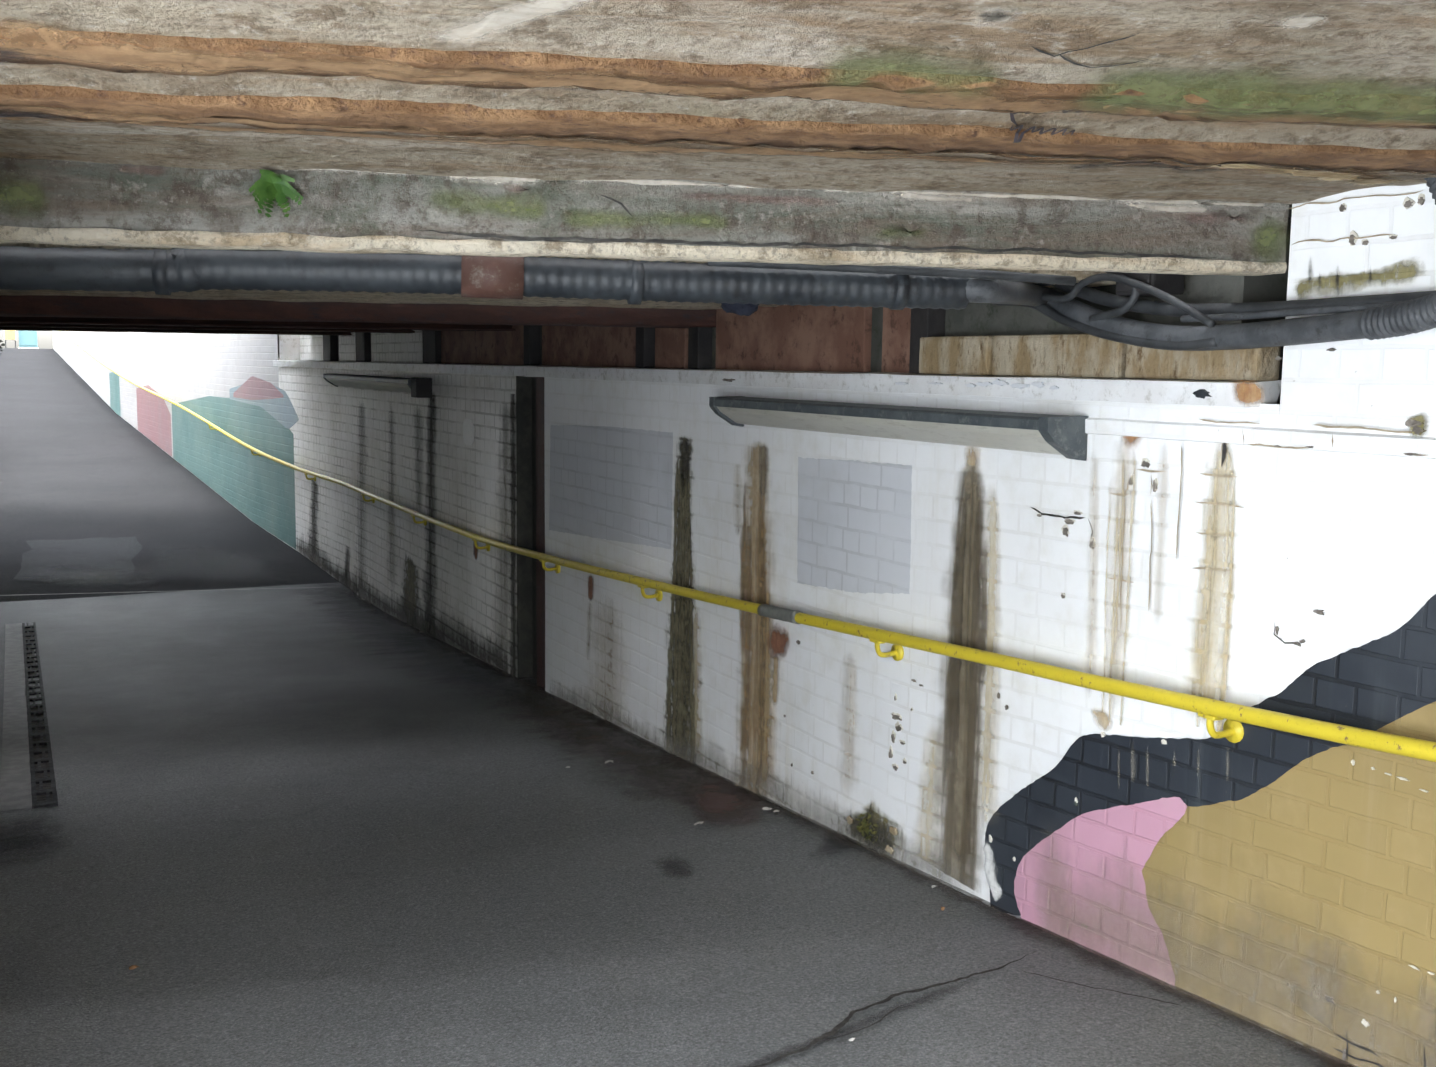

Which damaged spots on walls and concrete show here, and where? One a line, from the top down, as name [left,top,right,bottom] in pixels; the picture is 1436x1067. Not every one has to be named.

water stain [309,480,318,551]
water stain [345,407,364,582]
water stain [389,395,437,620]
water stain [498,394,518,677]
water stain [666,440,700,764]
corrosion [740,445,800,795]
peeling [888,693,913,771]
water stain [923,449,997,888]
crack [746,952,1184,1067]